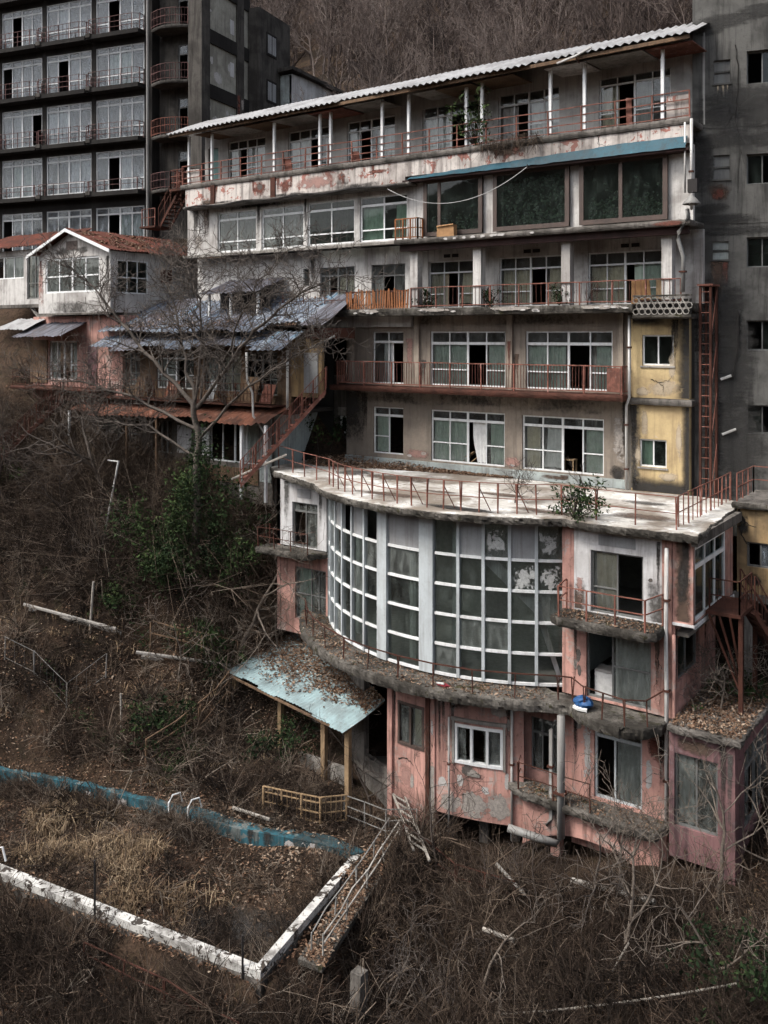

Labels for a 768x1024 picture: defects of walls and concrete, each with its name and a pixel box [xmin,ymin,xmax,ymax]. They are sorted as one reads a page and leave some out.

water stain [692,85,768,236]
peeling [430,708,510,832]